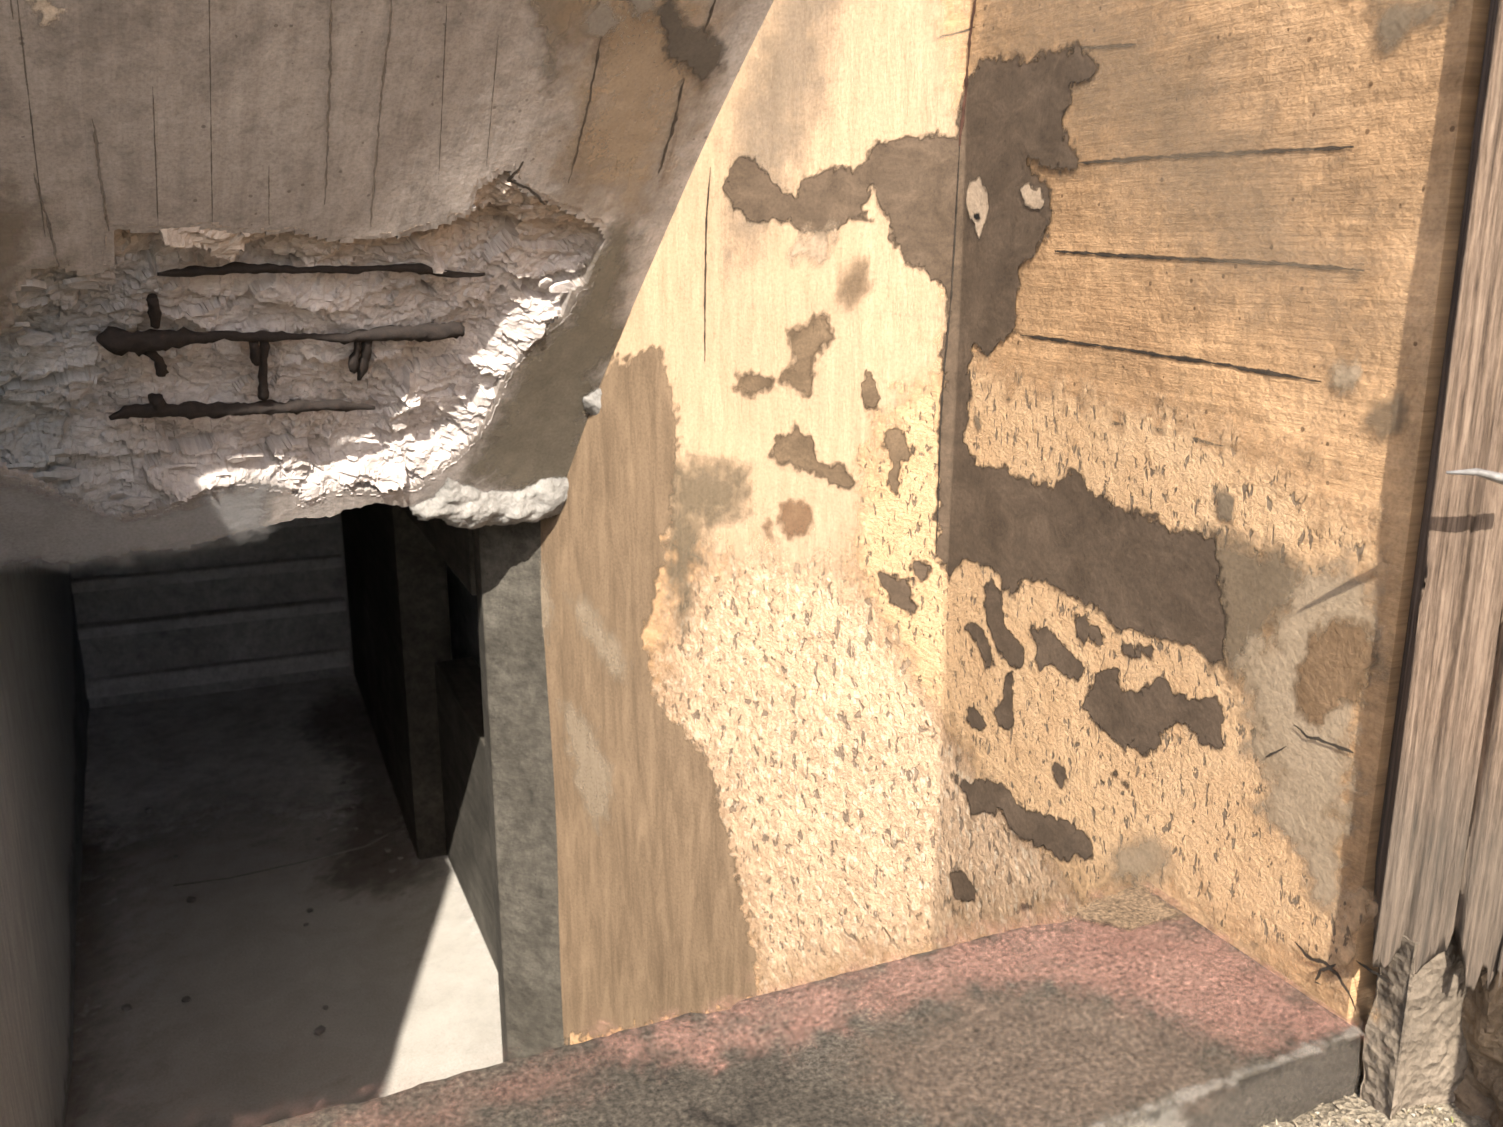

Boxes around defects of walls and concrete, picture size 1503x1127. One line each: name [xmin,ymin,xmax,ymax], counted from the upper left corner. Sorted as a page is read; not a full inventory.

crack [33,173,59,267]
crack [92,119,109,231]
crack [324,0,333,205]
crack [370,0,393,225]
crack [507,36,602,205]
corrosion [96,261,485,420]
spalling [0,163,611,521]
flaking render [722,40,1388,998]